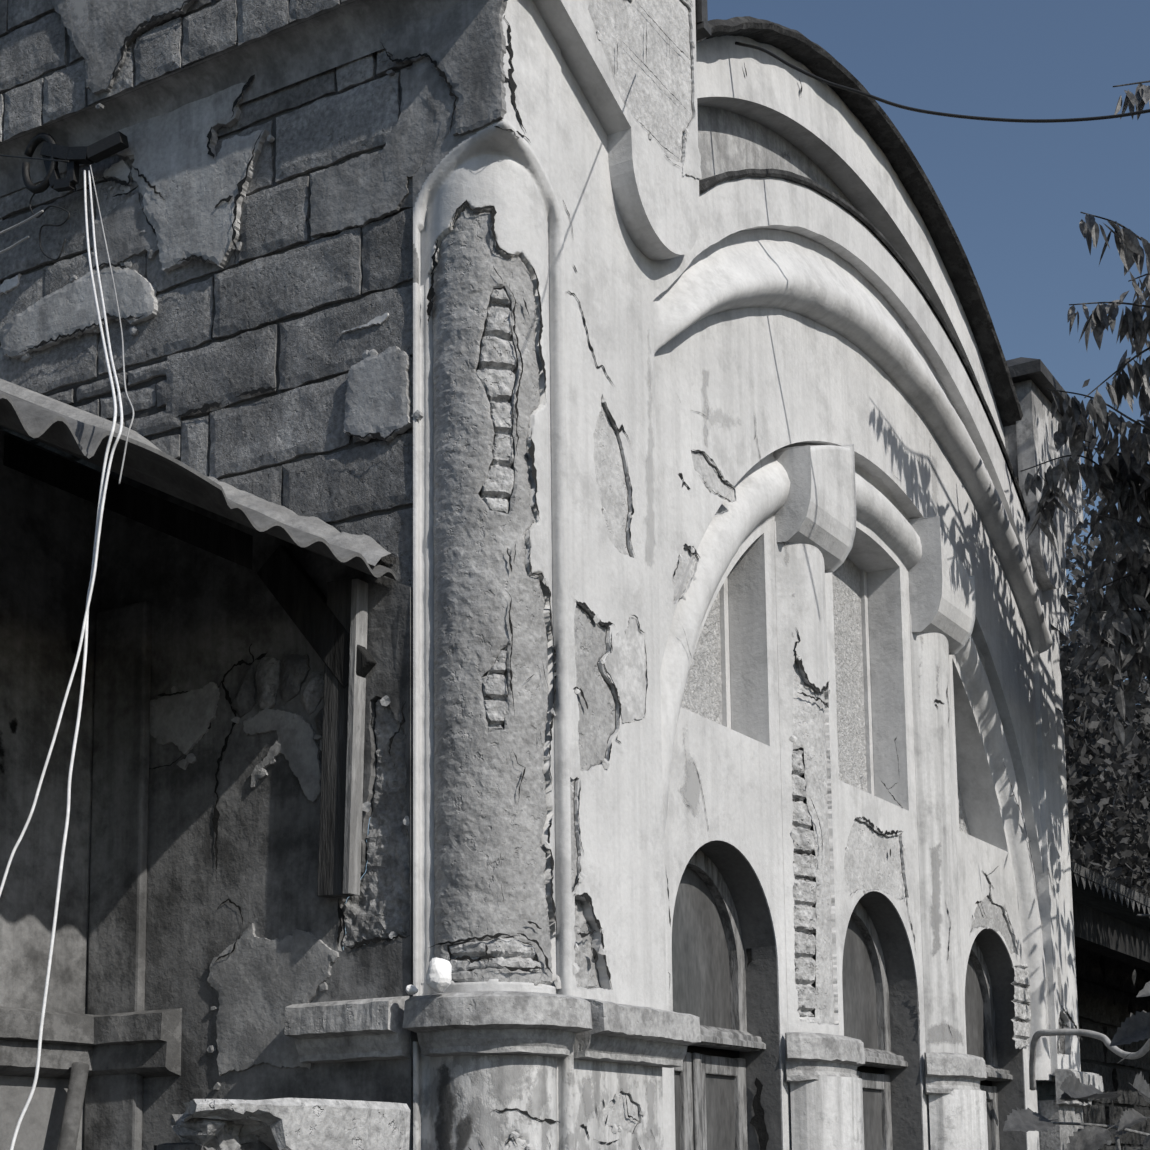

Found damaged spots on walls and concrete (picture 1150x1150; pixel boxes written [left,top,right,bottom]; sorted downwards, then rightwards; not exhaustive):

peeling [50,0,196,111]
peeling [0,75,275,362]
peeling [309,0,507,238]
spalling [588,0,702,179]
spalling [341,200,561,989]
spalling [593,395,634,556]
peeling [150,682,220,770]
peeling [206,695,411,1090]
spalling [570,601,647,990]
spalling [789,628,835,1025]
flaking render [970,874,1032,1049]
crack [491,1106,654,1149]